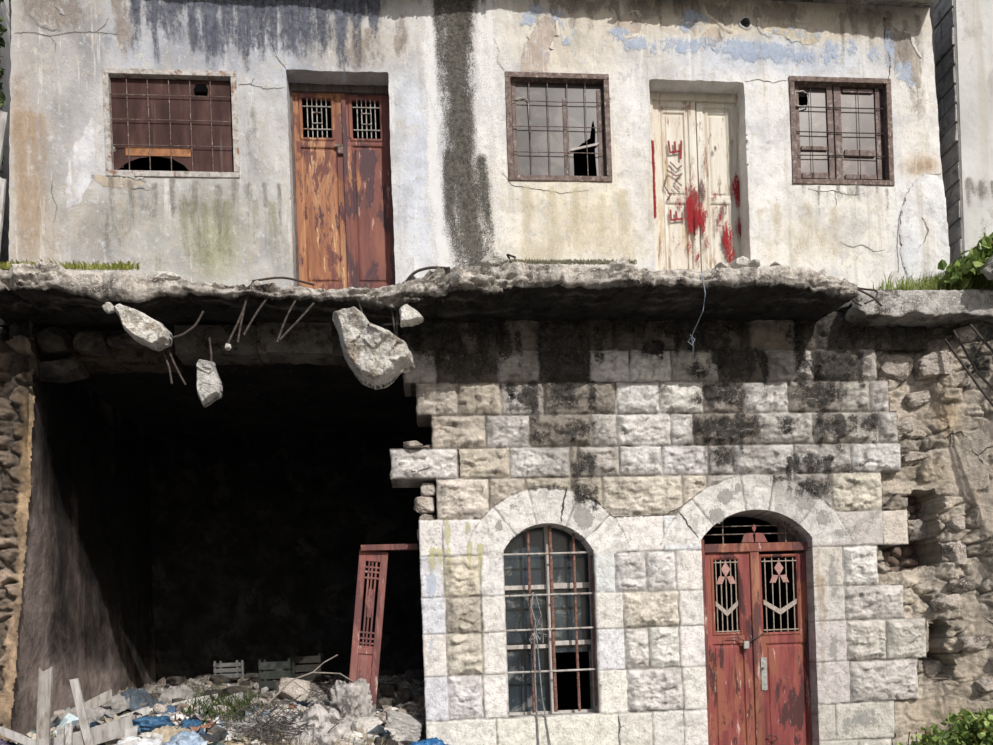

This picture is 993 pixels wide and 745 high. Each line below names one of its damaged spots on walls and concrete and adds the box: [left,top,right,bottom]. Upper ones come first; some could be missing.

crack [17,21,116,52]
water stain [111,0,380,78]
peeling [608,2,858,66]
water stain [419,0,505,270]
spalling [406,266,450,282]
spalling [224,277,315,344]
spalling [0,323,146,383]
water stain [506,320,769,468]
water stain [770,312,964,501]
crack [945,431,992,463]
water stain [570,453,599,511]
spalling [879,496,928,571]